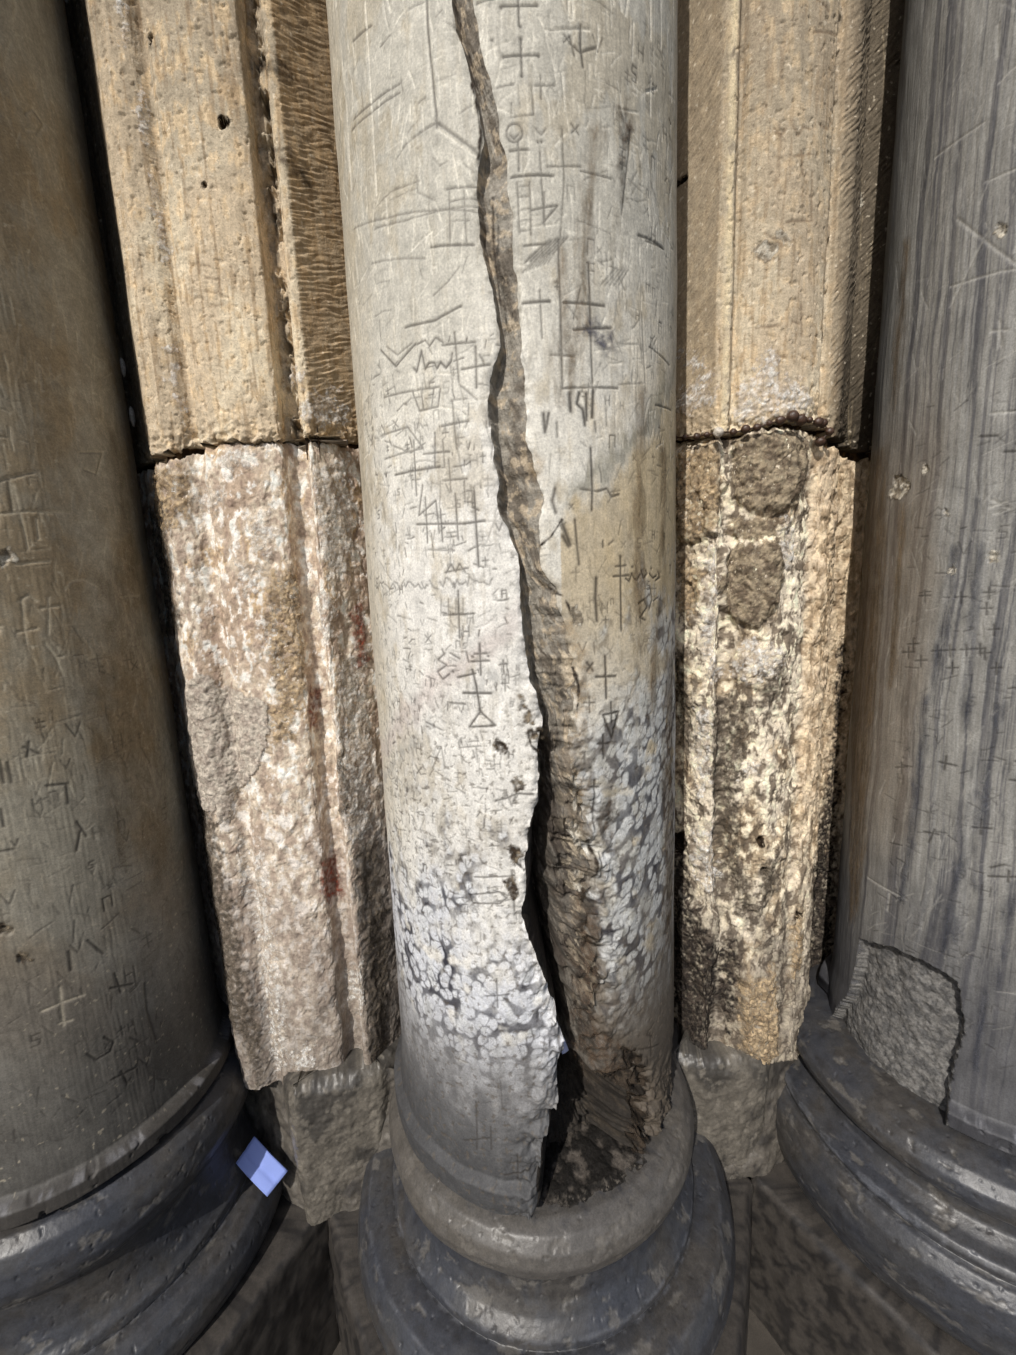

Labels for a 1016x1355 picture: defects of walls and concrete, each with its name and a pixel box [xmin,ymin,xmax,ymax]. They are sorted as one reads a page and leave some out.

crack [137,426,359,474]
crack [676,423,871,463]
crack [452,0,643,1207]
peeling [569,816,586,853]
peeling [572,870,584,891]
leakage [666,648,741,1050]
leakage [709,668,783,917]
leakage [809,458,895,985]
spalling [832,938,965,1126]
spalling [540,1047,649,1207]